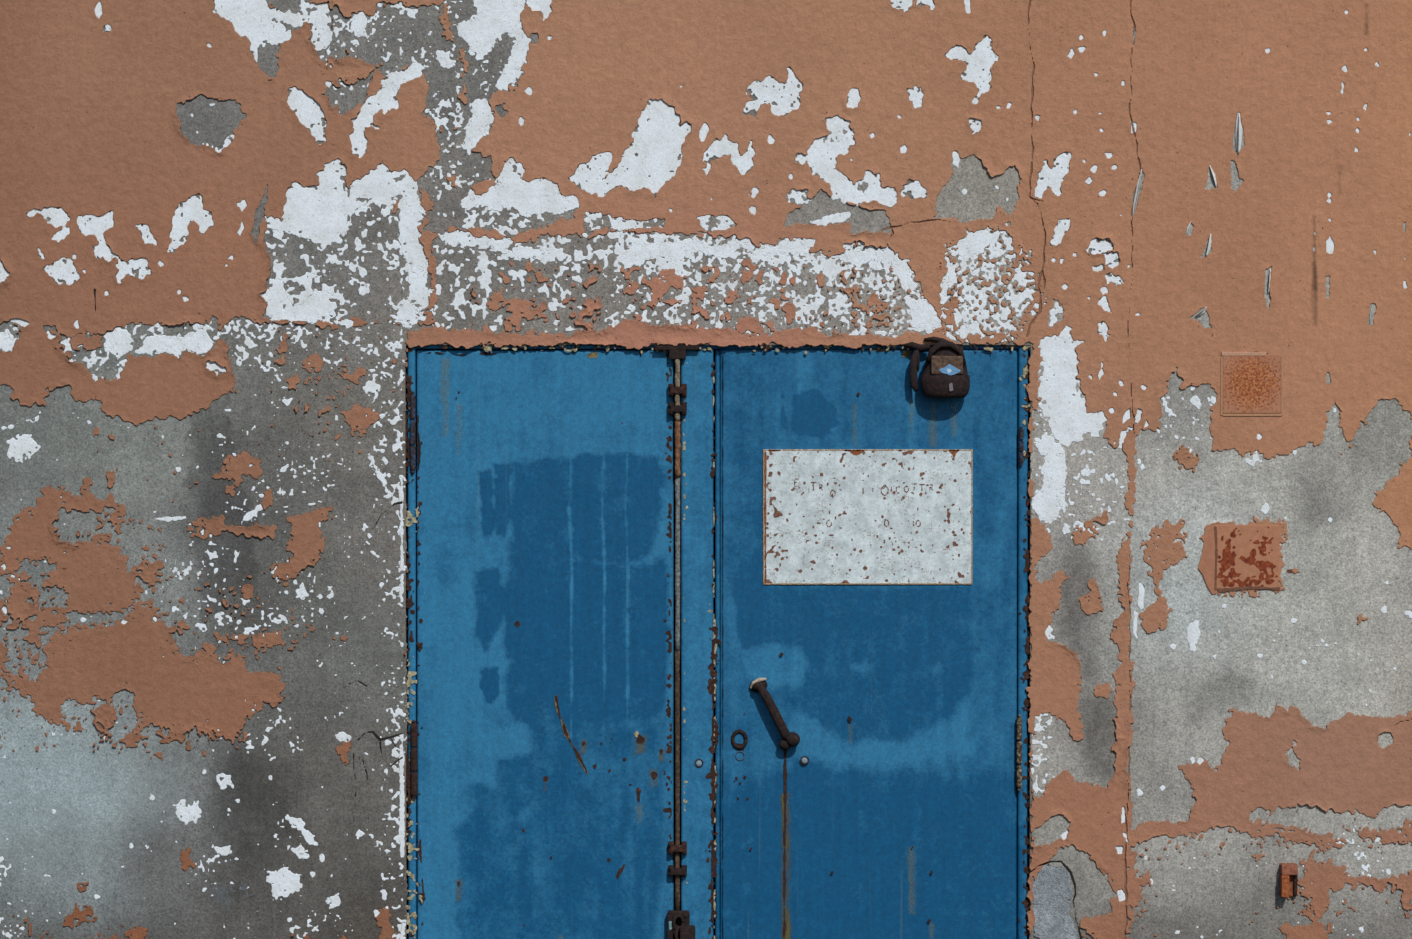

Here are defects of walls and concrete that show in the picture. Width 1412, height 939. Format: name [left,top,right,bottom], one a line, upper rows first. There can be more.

peeling [1035,152,1117,199]
peeling [1050,219,1130,342]
crack [1128,0,1141,285]
peeling [1313,192,1334,254]
peeling [0,0,1047,939]
peeling [1029,299,1412,939]
corrosion [1217,523,1298,593]
corrosion [629,599,672,850]
crack [1123,555,1131,939]
corrosion [781,750,809,939]
crack [1031,861,1082,939]